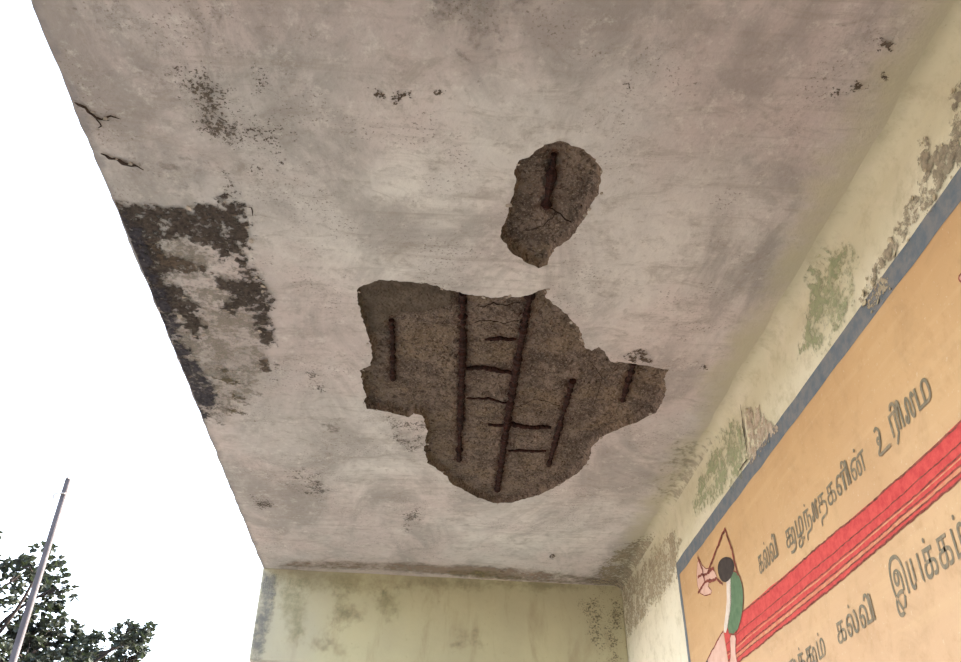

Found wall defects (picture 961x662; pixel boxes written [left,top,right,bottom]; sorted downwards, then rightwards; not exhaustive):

crack [74,102,120,128]
water stain [165,66,296,165]
crack [101,153,144,170]
spalling [500,141,603,268]
water stain [115,171,280,425]
spalling [357,280,668,505]
water stain [285,562,617,585]
water stain [252,575,276,652]
water stain [581,594,624,661]